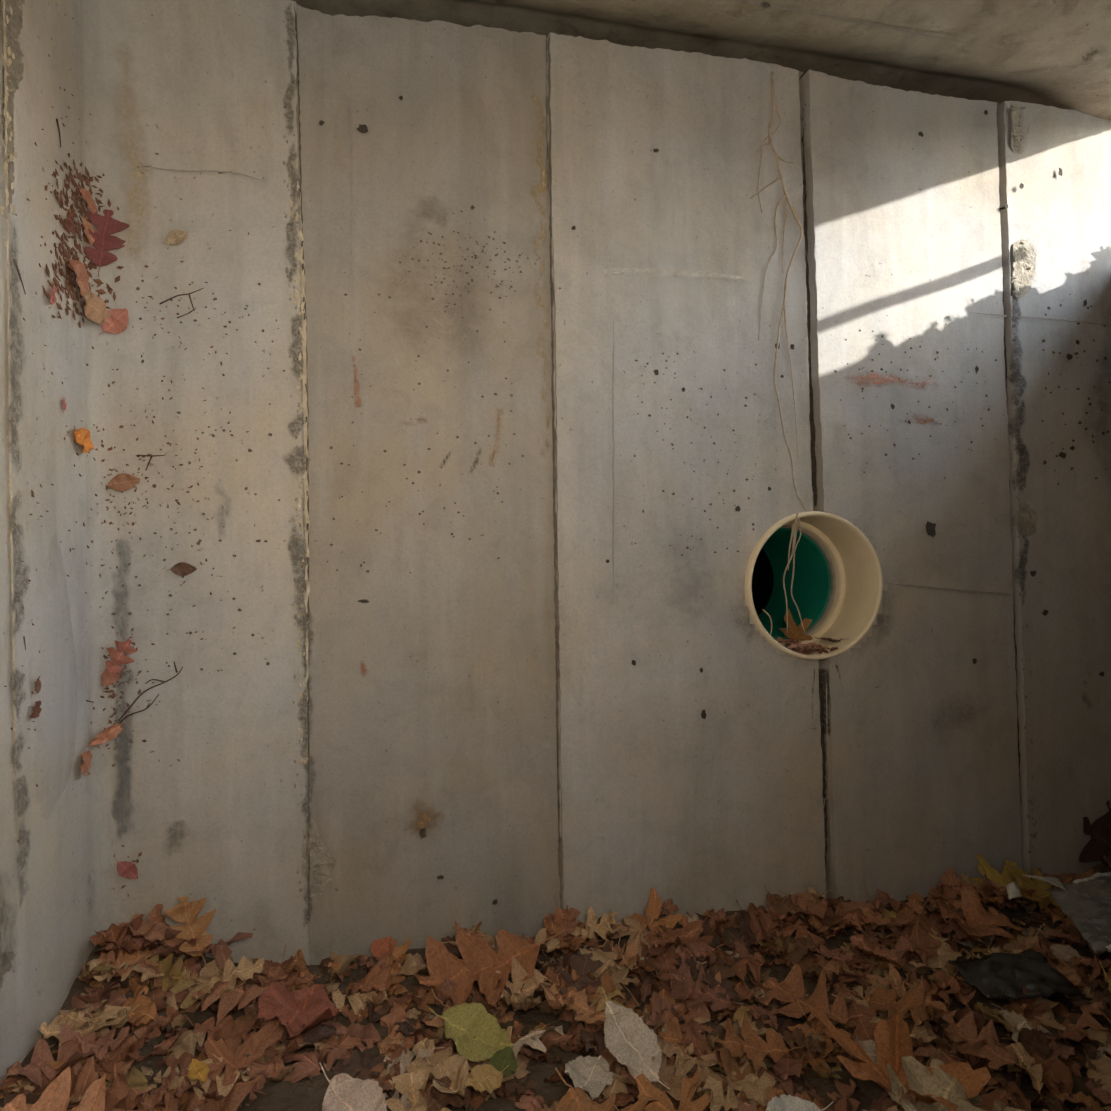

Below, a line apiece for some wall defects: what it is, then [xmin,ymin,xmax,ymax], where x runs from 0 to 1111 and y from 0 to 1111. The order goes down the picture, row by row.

spalling [0,932,15,992]